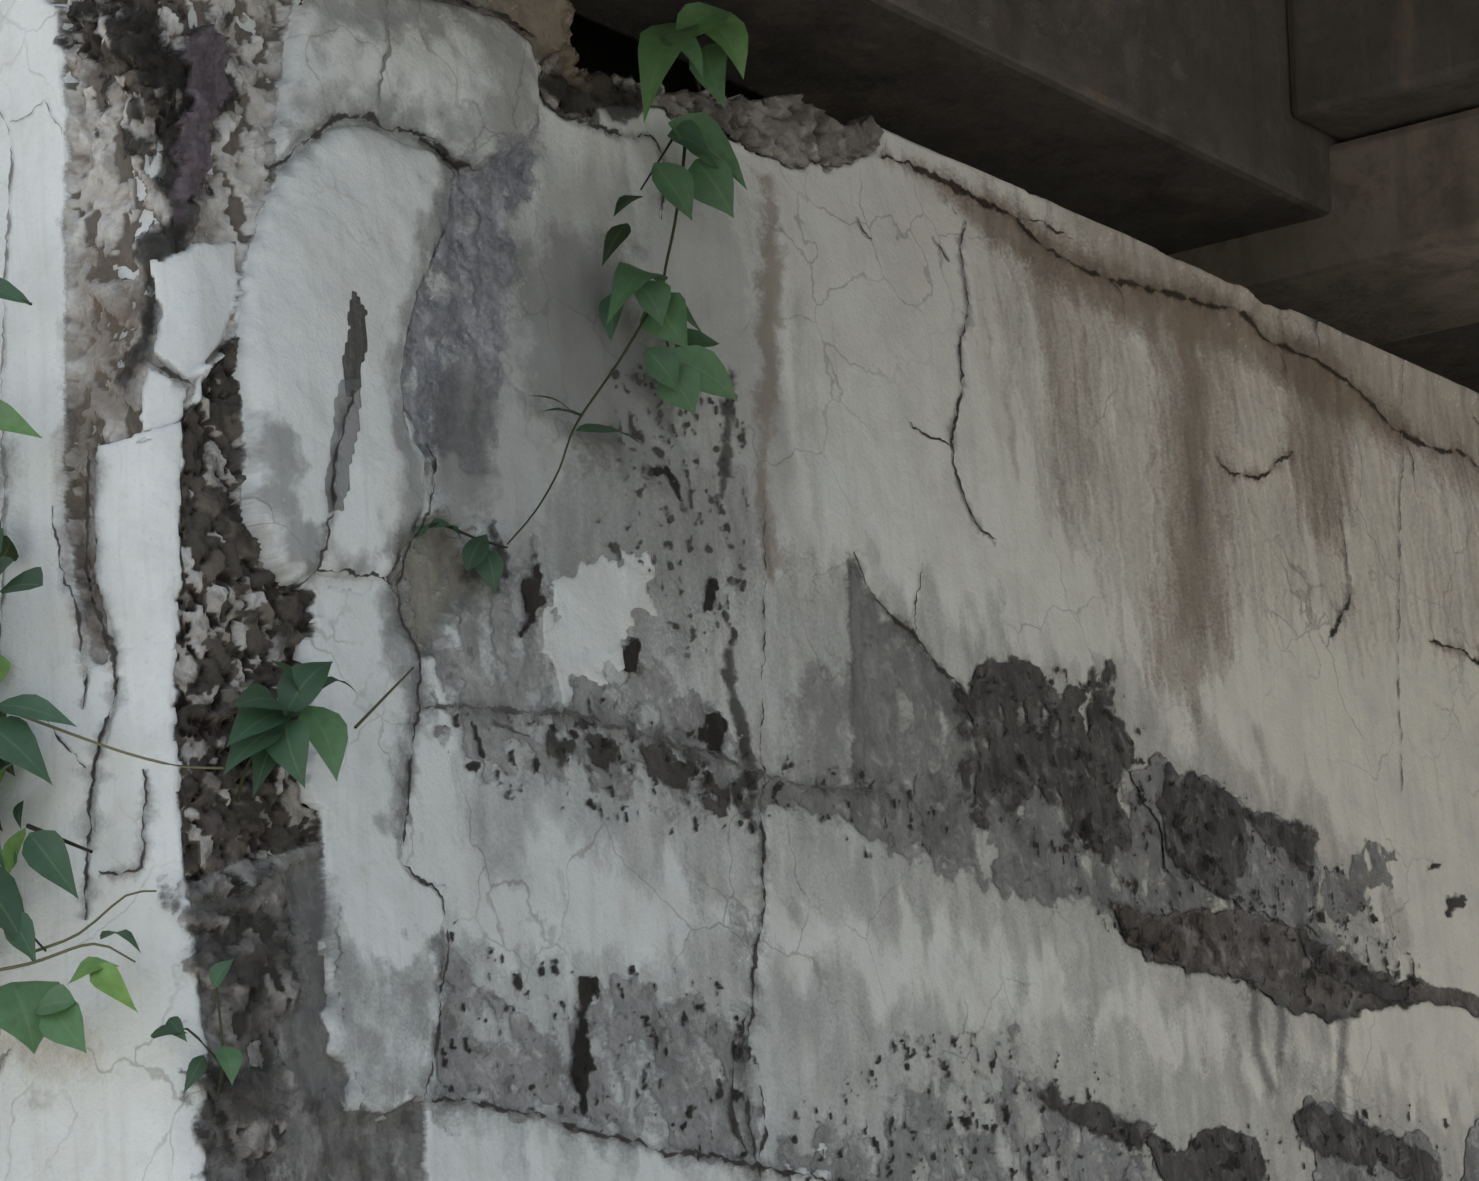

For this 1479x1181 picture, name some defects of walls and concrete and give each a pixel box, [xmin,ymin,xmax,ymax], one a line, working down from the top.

crack [0,100,62,394]
crack [47,447,189,920]
spalling [49,0,762,1181]
crack [280,388,877,1181]
flaking render [400,10,884,475]
leakage [609,366,794,834]
leakage [814,561,1008,850]
leakage [791,1033,1045,1181]
peeling [424,520,1479,1025]
peeling [778,1060,1267,1181]
crack [881,154,1479,792]
leakage [977,666,1445,1181]